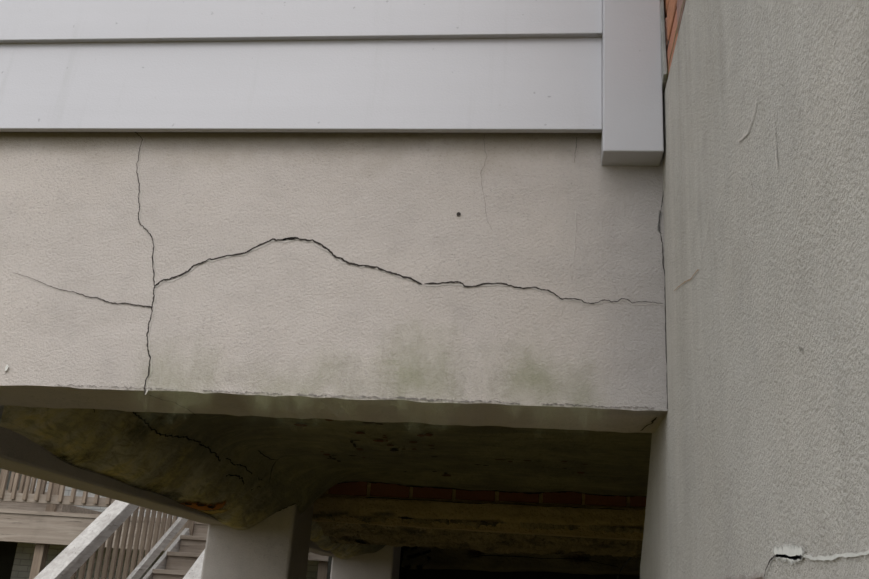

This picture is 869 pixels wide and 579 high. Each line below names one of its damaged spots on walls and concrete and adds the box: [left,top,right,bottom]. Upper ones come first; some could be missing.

crack [12,132,667,490]
crack [764,550,869,576]